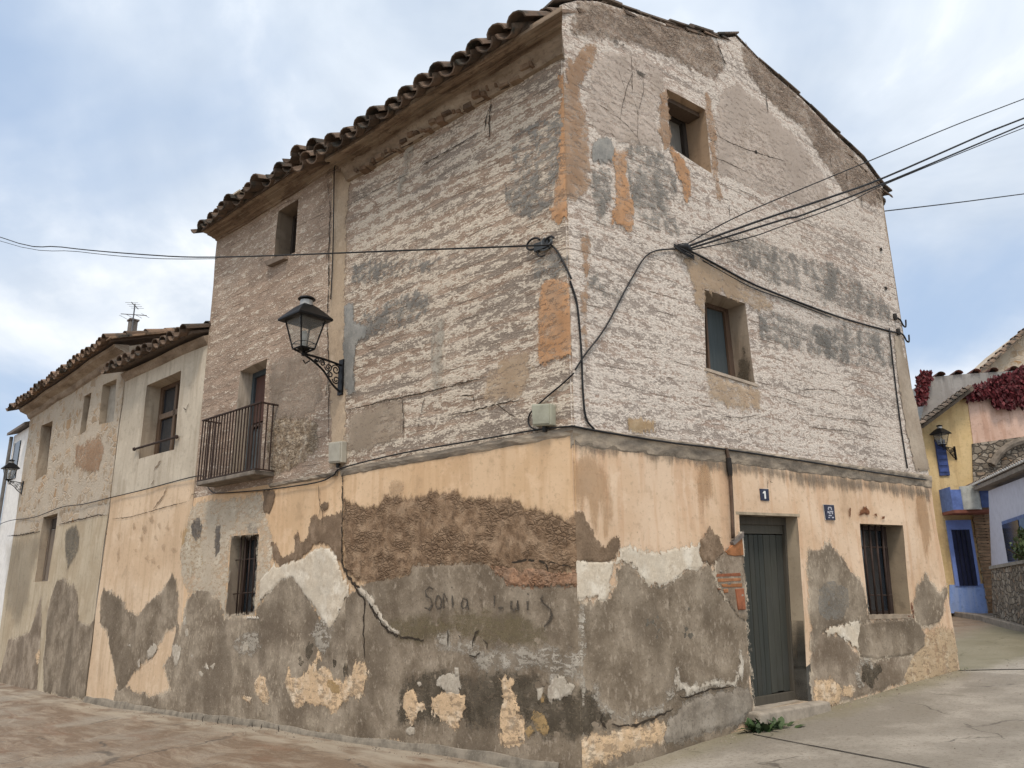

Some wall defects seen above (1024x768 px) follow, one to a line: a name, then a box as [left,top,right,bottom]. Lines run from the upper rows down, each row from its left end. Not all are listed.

crack [318,474,424,659]
flaking render [0,532,755,768]
water stain [574,511,621,562]
flaking render [806,540,959,706]